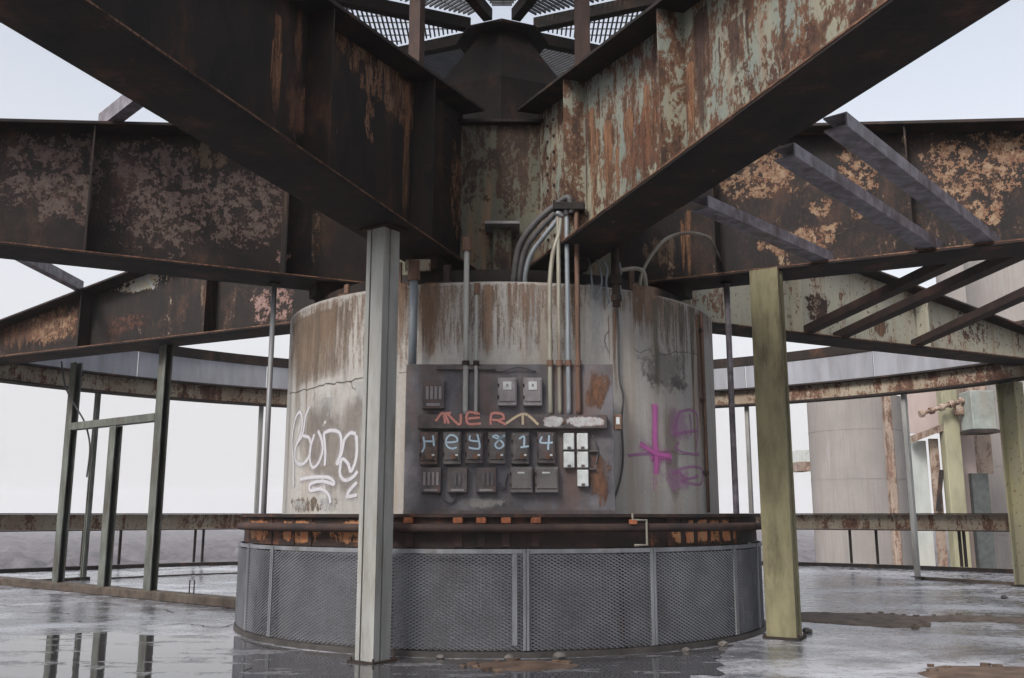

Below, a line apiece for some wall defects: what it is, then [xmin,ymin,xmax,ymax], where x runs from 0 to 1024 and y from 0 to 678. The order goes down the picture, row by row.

rust [685,4,816,141]
rust [585,83,661,200]
rust [1,301,80,351]
water stain [294,302,350,395]
water stain [482,286,494,350]
water stain [654,299,694,382]
crack [289,377,363,399]
rust [585,374,610,409]
rust [283,520,359,544]
rust [671,519,736,543]